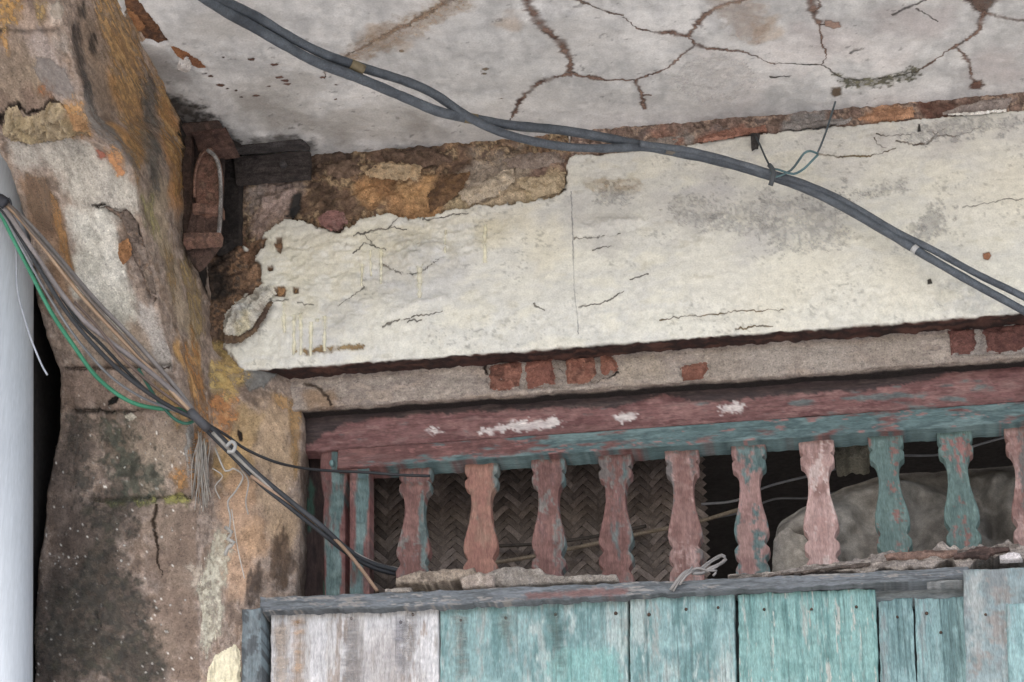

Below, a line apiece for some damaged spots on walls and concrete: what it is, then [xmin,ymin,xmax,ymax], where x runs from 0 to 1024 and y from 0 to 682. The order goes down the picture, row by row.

spalling [125,0,291,98]
crack [345,0,454,57]
crack [510,0,1024,120]
crack [352,213,468,275]
crack [571,193,621,251]
spalling [207,92,1024,367]
crack [382,310,443,328]
crack [580,273,649,307]
spalling [486,355,619,393]
crack [95,493,191,575]